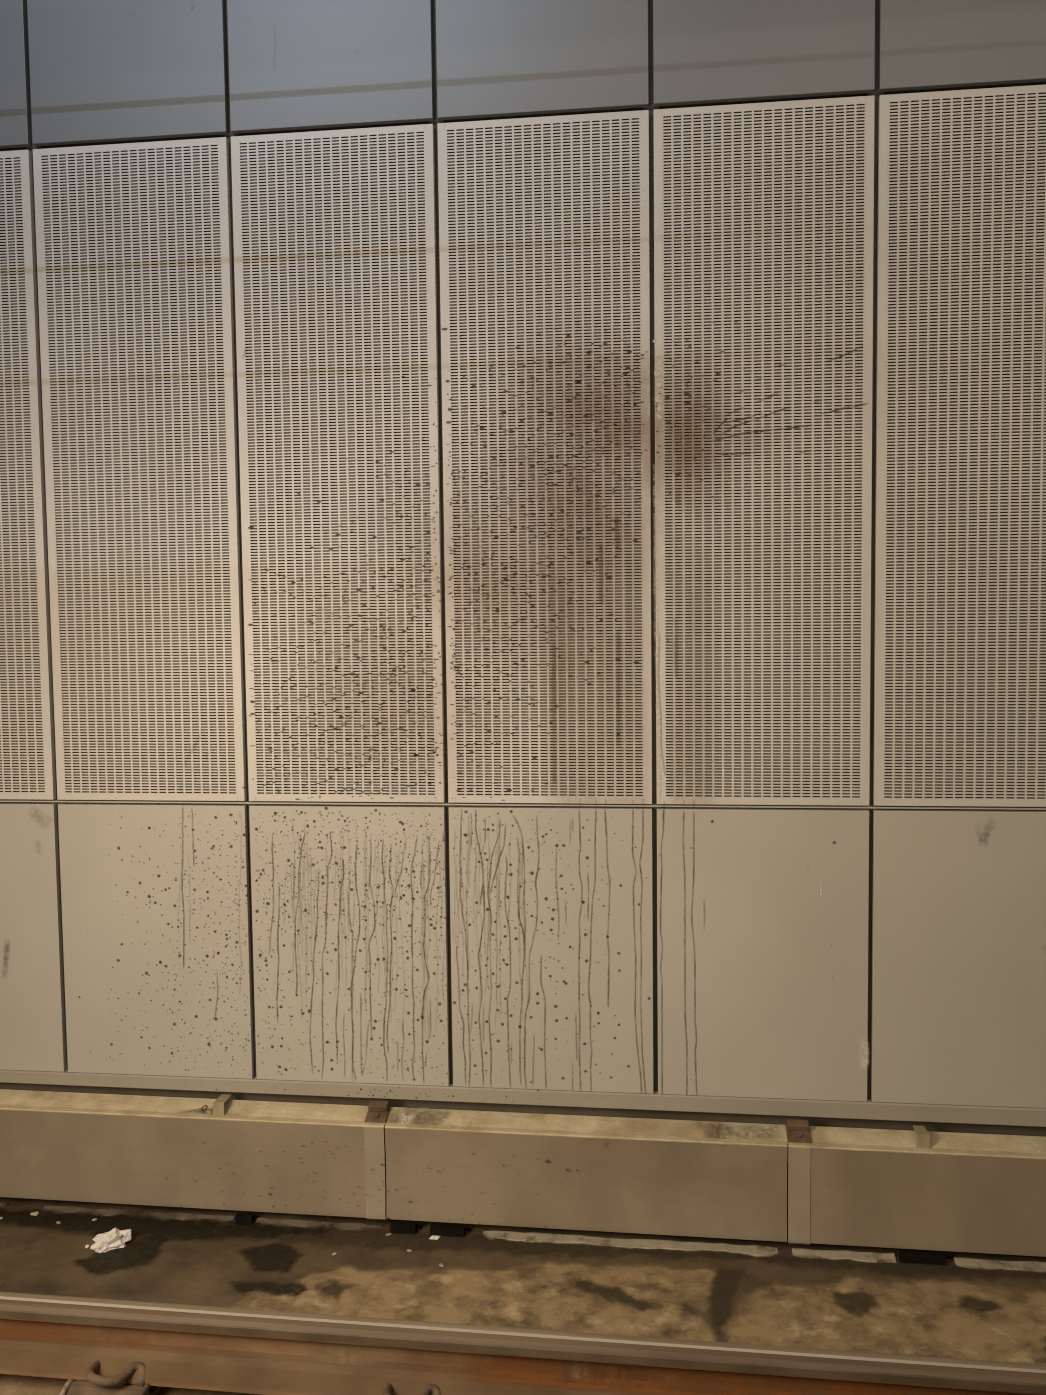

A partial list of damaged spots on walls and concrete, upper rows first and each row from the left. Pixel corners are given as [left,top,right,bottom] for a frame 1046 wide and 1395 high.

water stain [108,321,807,1124]